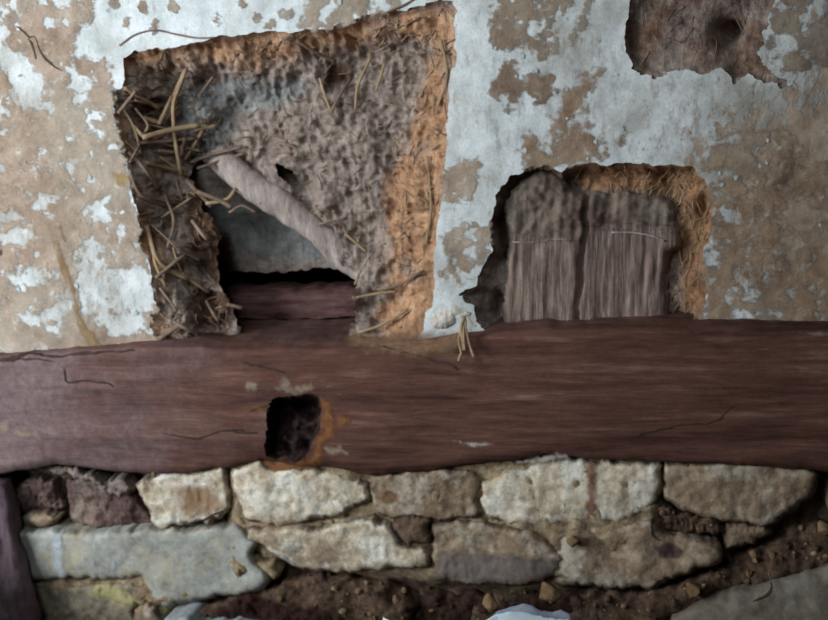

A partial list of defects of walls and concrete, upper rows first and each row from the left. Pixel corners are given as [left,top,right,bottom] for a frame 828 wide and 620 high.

spalling [0,0,828,353]
crack [0,349,133,388]
rust [265,398,350,472]